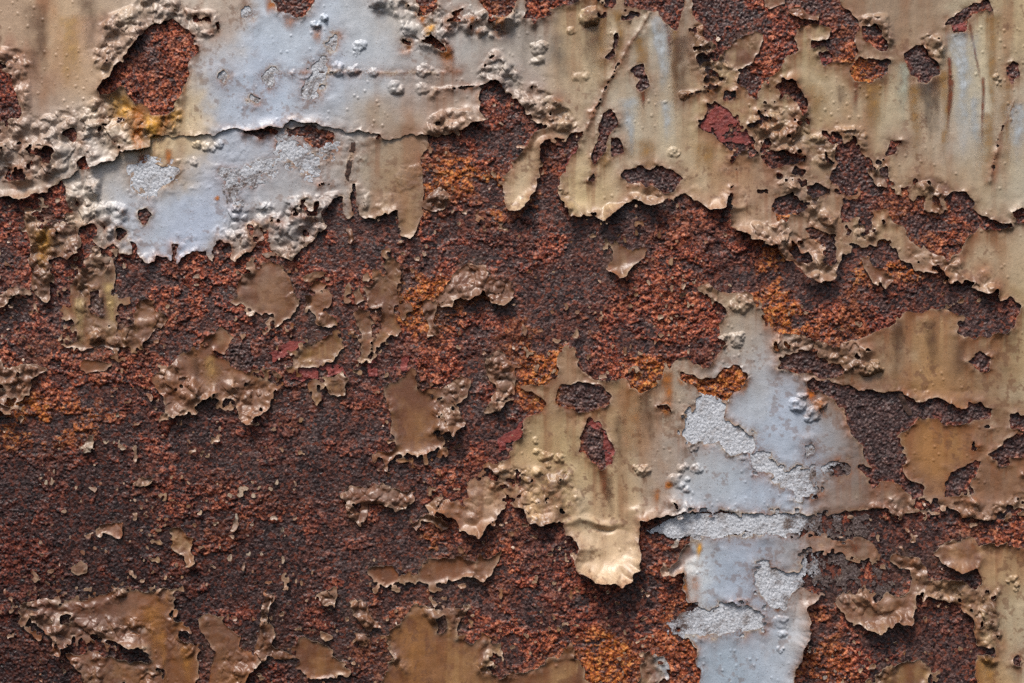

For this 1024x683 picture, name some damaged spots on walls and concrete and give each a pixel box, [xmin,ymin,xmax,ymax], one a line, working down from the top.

corrosion [417,154,503,241]
corrosion [9,346,177,451]
corrosion [146,247,275,347]
corrosion [415,356,463,390]
corrosion [397,278,489,334]
peeling [0,0,1024,527]
corrosion [508,335,563,386]
corrosion [583,223,746,419]
corrosion [121,463,312,558]
peeling [411,282,1024,683]
peeling [9,579,356,683]
corrosion [794,641,873,683]